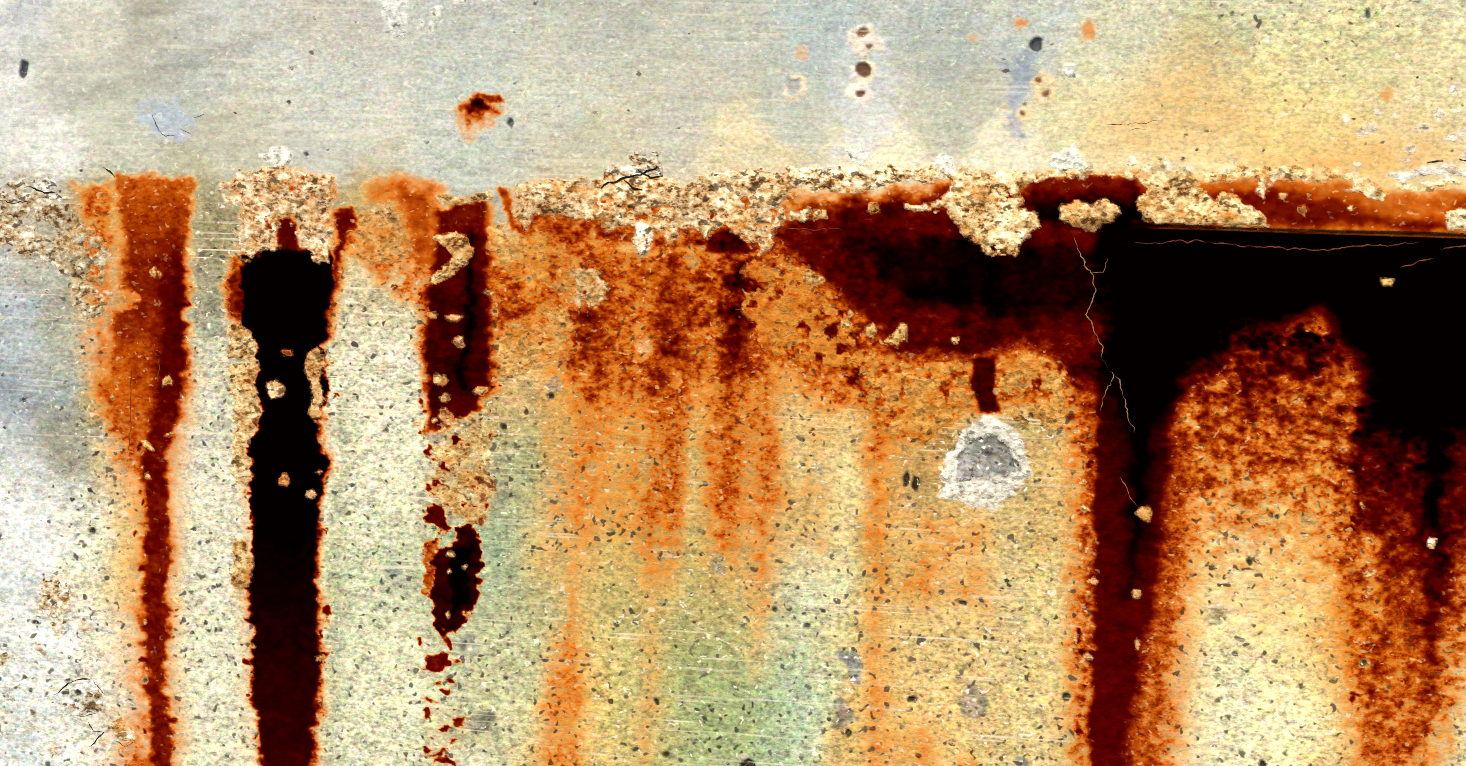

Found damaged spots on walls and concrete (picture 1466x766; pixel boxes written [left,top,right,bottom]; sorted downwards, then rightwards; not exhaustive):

corrosion [448,89,512,147]
peeling [1035,62,1079,97]
spalling [0,174,143,326]
spalling [210,74,1466,371]
corrosion [64,166,208,766]
corrosion [219,162,1466,766]
spalling [956,436,1021,483]
peeling [995,350,1073,432]